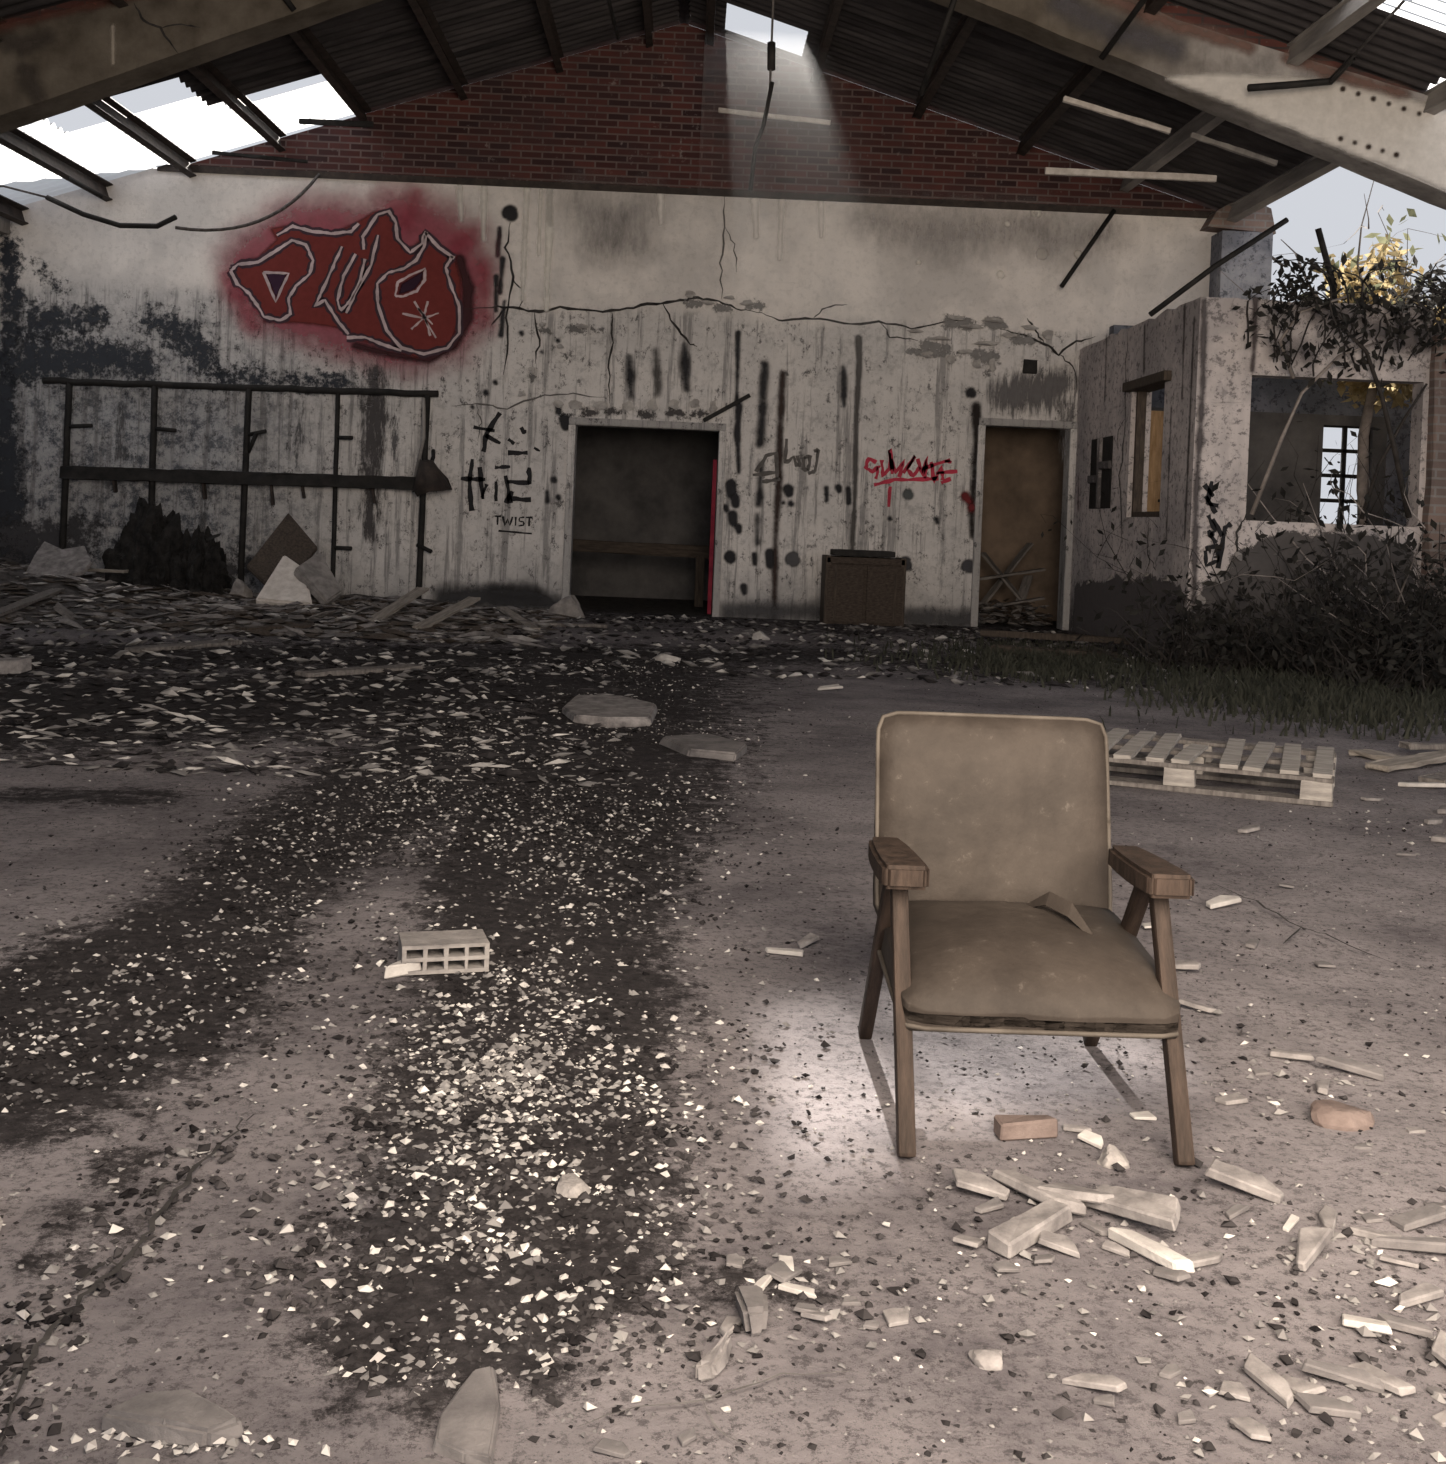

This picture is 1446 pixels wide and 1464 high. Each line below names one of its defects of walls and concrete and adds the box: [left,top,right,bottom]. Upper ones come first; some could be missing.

crack [457,197,958,441]
damp [0,224,400,564]
damp [986,370,1079,460]
damp [436,585,560,610]
damp [722,603,820,621]
damp [904,609,980,627]